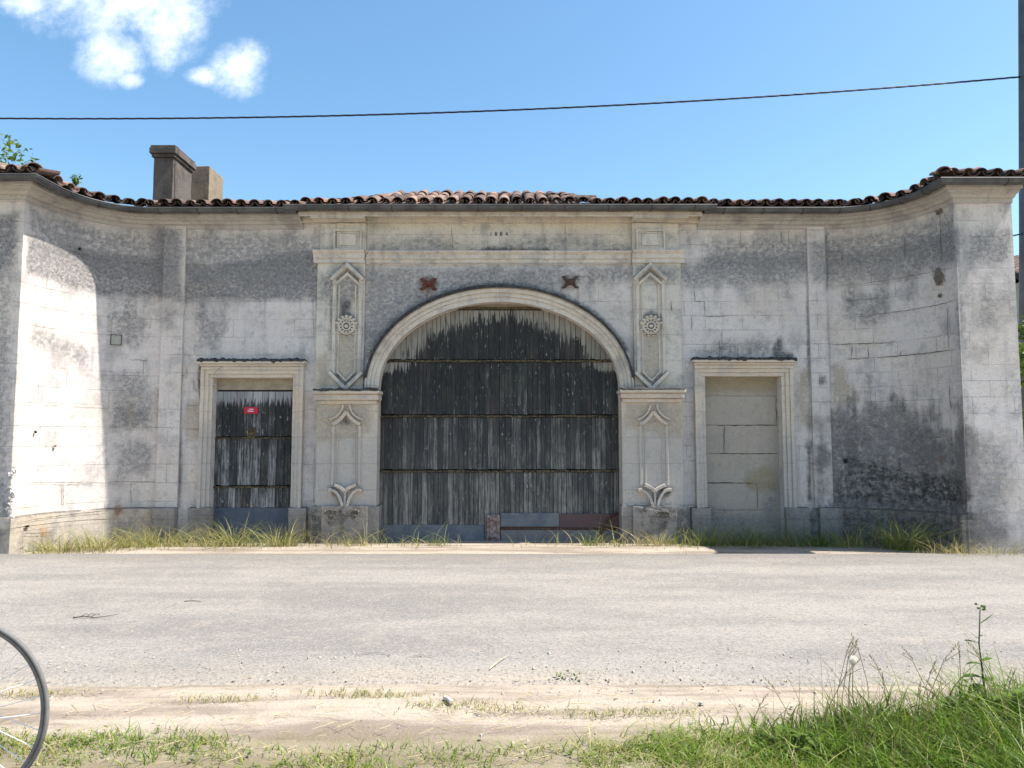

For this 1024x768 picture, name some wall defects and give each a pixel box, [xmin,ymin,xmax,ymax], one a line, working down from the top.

water stain [642,219,1008,291]
spalling [933,268,945,298]
water stain [810,368,1007,546]